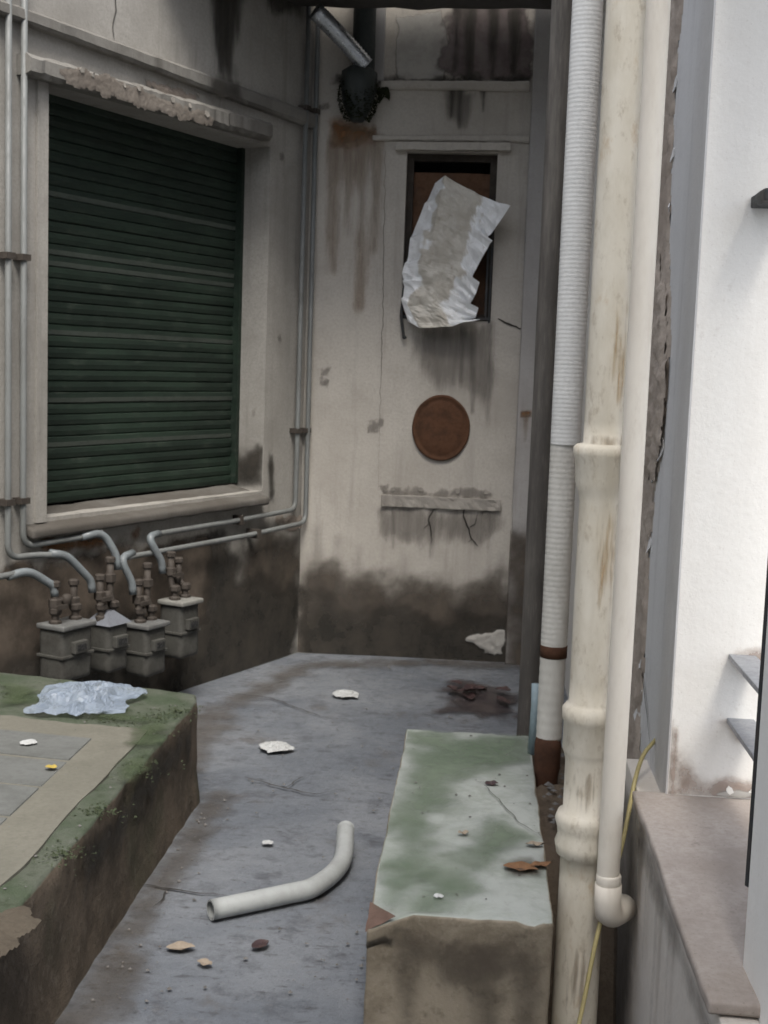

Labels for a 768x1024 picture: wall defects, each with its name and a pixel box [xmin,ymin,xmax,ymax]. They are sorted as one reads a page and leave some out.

water stain [432,8,534,120]
flaking render [60,67,213,126]
flaking render [627,0,684,759]
water stain [232,446,273,497]
flaking render [382,486,488,499]
crack [463,510,477,545]
water stain [72,532,526,692]
water stain [0,656,40,676]
water stain [669,732,752,798]
spalling [0,906,41,958]